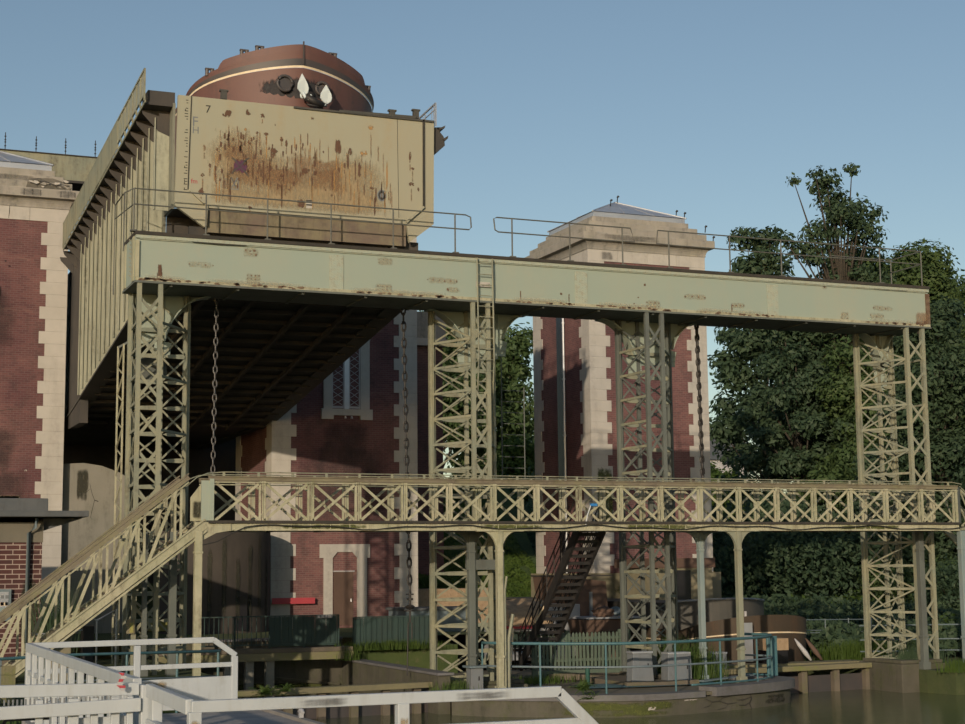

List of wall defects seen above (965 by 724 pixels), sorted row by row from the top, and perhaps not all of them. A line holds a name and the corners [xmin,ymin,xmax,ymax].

rust [198,109,392,215]